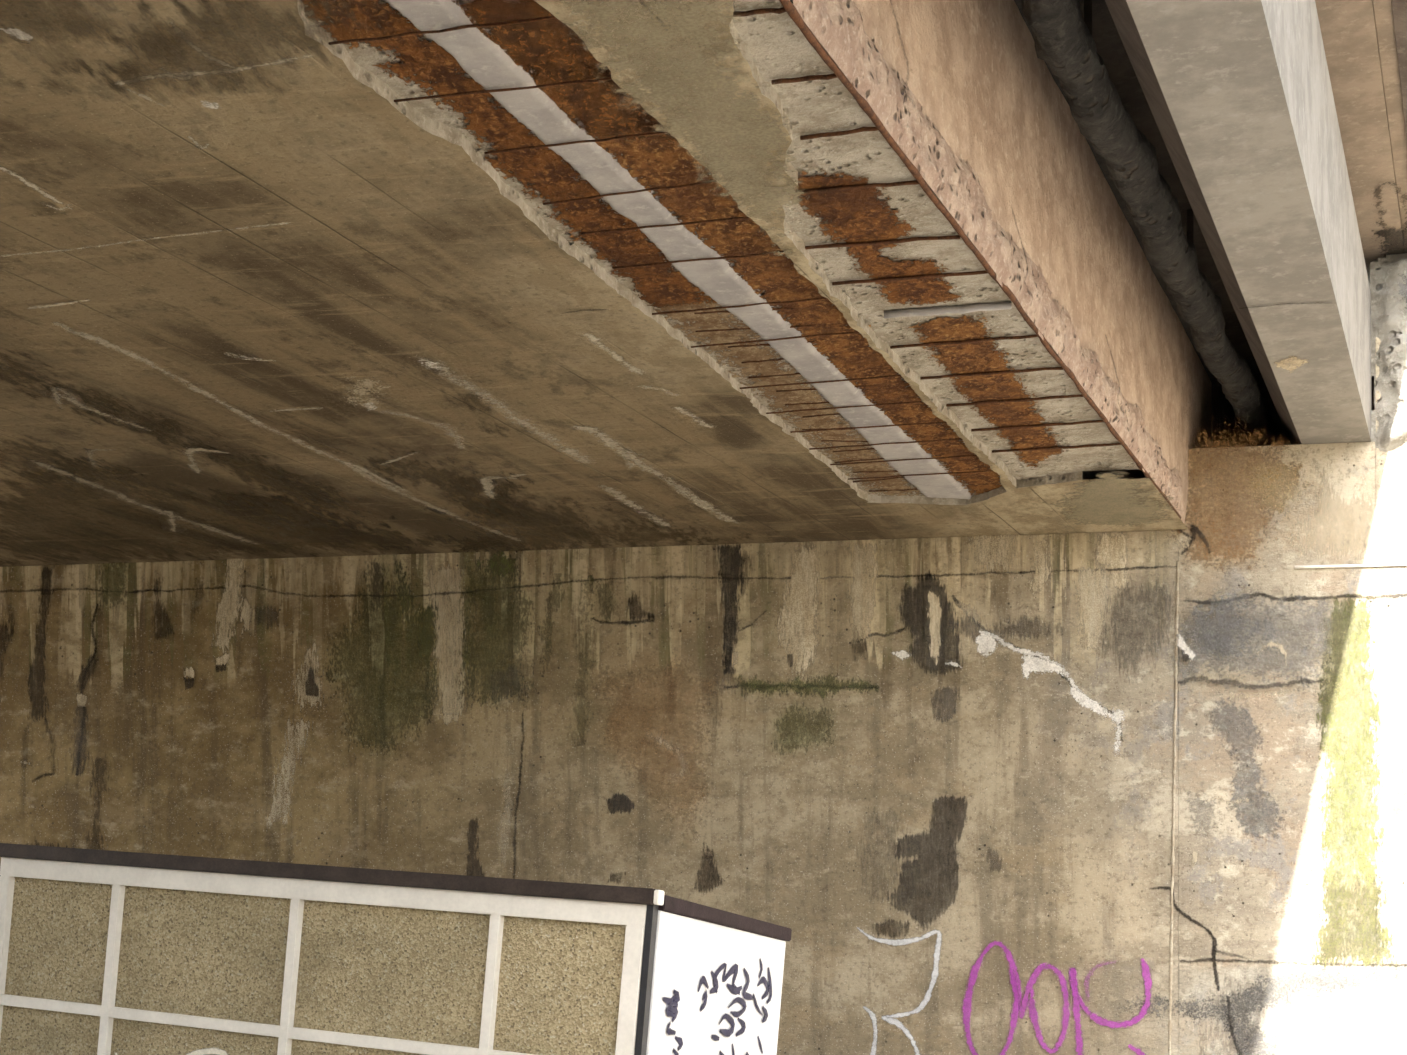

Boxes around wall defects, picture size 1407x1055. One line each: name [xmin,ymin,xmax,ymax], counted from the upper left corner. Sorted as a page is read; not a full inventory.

spalling [297,0,1182,519]
damp [428,564,467,725]
damp [847,532,1127,750]
crack [1178,676,1324,698]
crack [1190,592,1407,605]
damp [875,795,967,937]